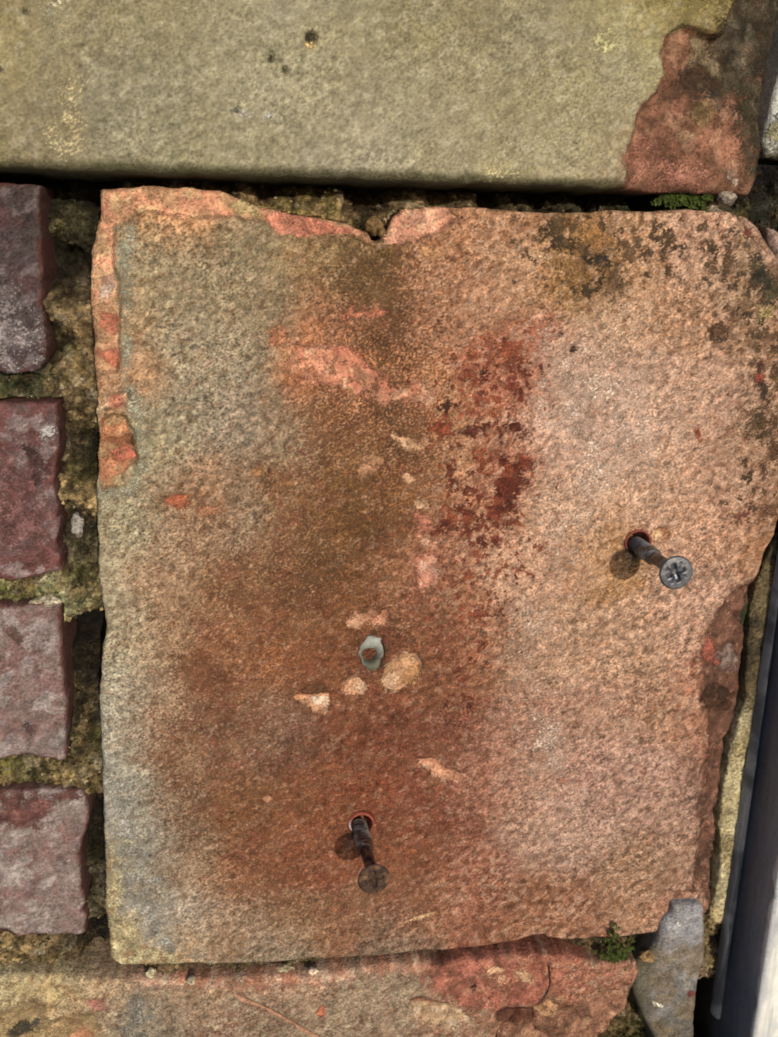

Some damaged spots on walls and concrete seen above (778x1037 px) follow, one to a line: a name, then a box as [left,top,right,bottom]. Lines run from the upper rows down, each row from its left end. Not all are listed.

spalling [618,0,778,197]
damp [511,210,778,429]
damp [719,457,778,523]
rust [125,241,506,952]
crack [233,968,320,1037]
spalling [127,935,632,1037]